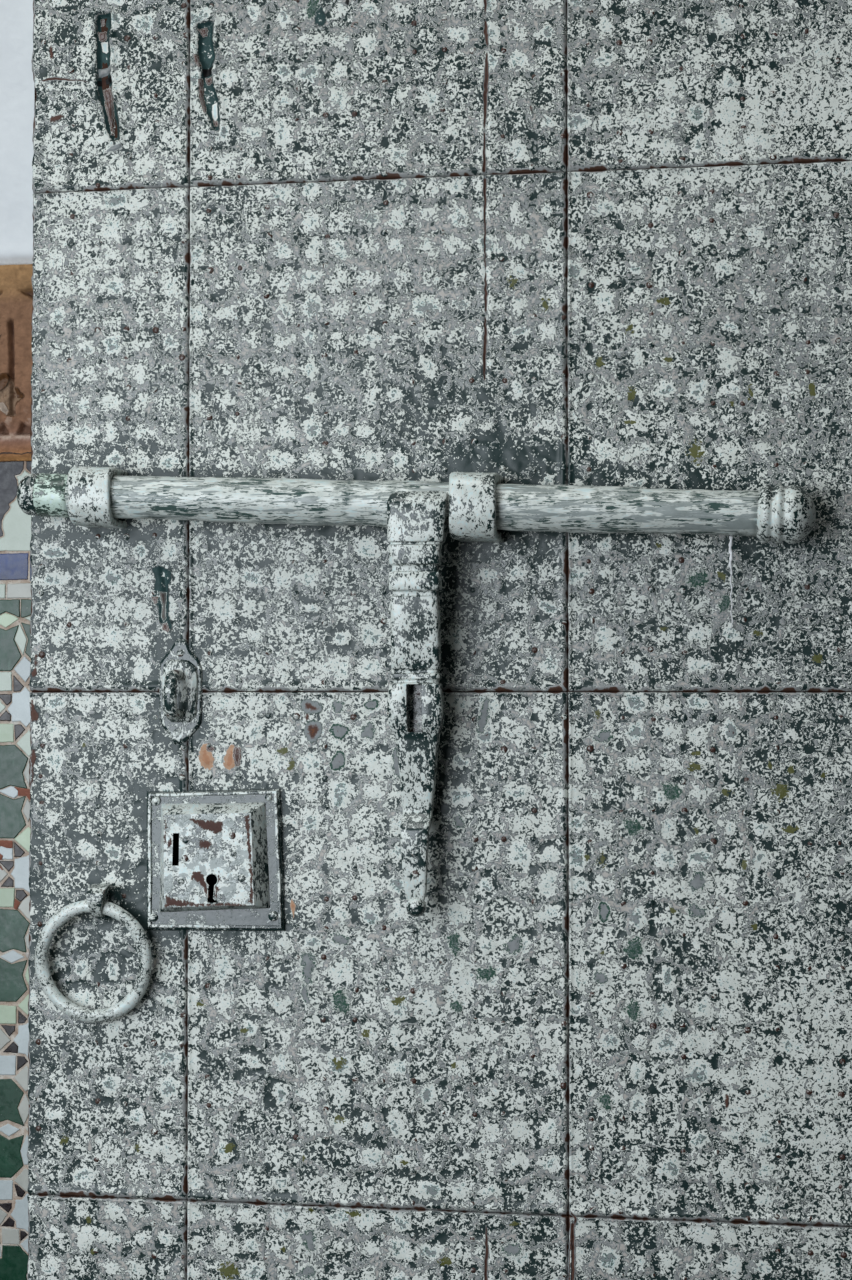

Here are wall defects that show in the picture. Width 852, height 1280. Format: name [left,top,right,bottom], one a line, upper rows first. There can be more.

corrosion [164,815,253,908]